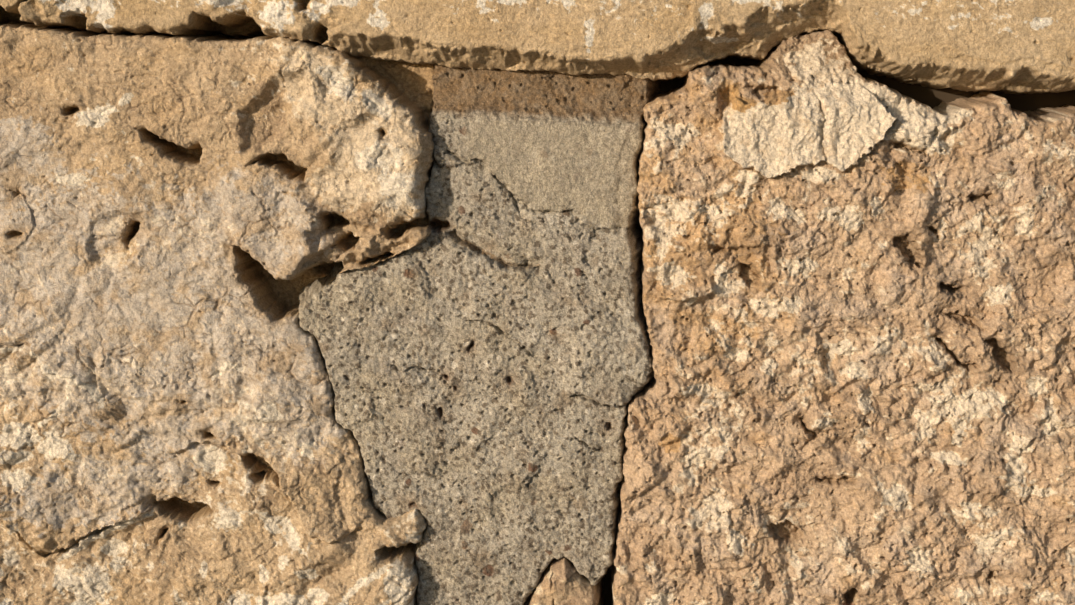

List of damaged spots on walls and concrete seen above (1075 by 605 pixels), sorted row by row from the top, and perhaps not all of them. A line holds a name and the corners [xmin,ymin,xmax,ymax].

crack [433,136,623,233]
crack [0,185,38,255]
crack [0,342,24,350]
spalling [462,338,478,356]
spalling [440,371,462,397]
spalling [503,374,520,389]
spalling [433,405,446,423]
spalling [601,418,616,436]
crack [0,511,115,560]